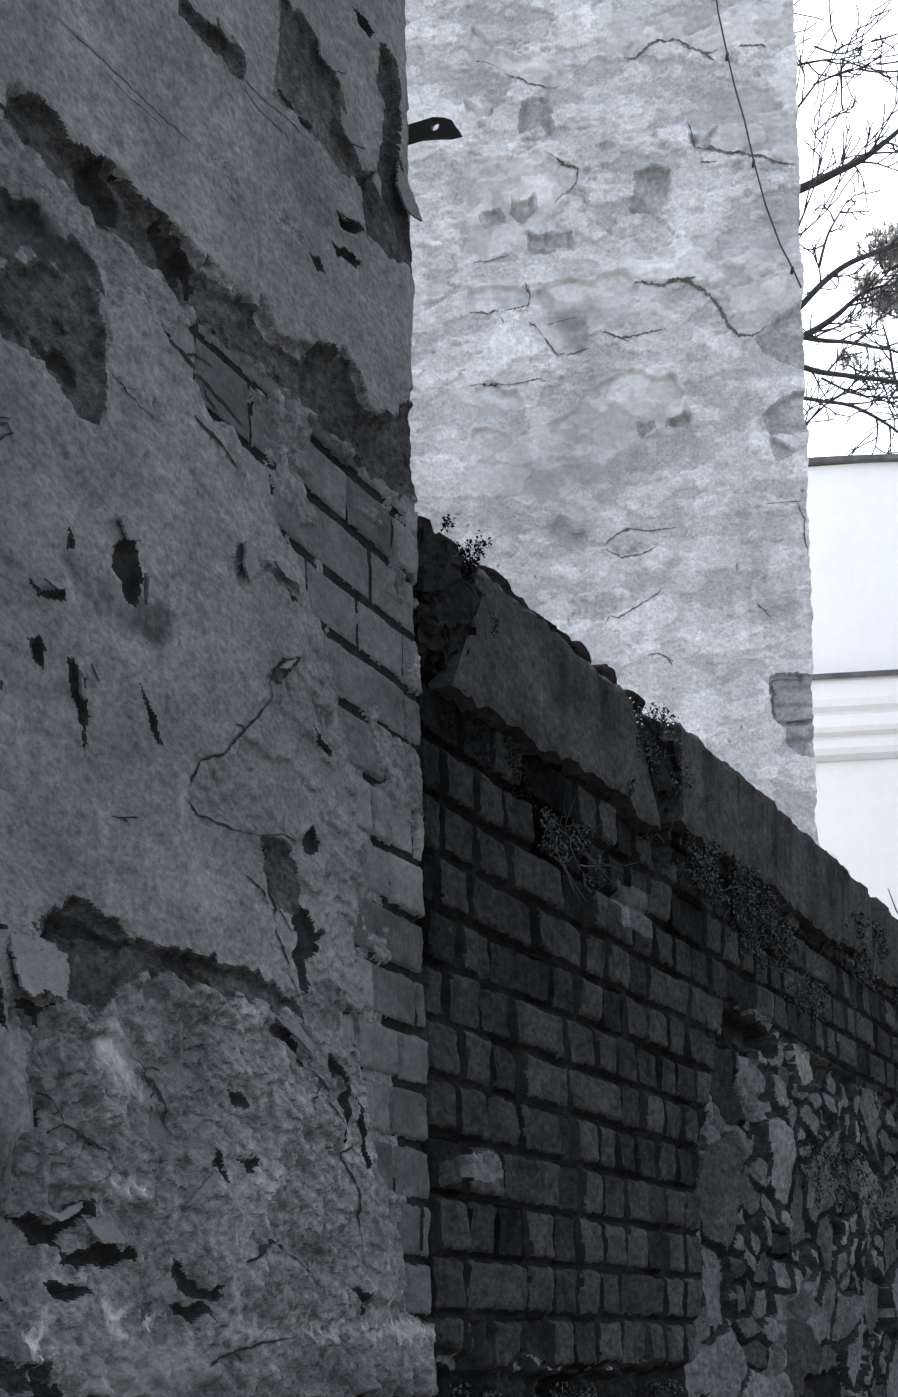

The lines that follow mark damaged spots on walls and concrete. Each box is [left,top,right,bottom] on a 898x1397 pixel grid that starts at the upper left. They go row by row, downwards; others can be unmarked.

flaking render [178,0,247,82]
crack [624,38,765,60]
crack [689,125,797,165]
flaking render [629,164,674,216]
flaking render [0,89,417,502]
crack [635,276,766,337]
flaking render [465,365,694,506]
flaking render [111,516,150,608]
crack [184,678,297,989]
flaking render [0,894,326,1052]
flaking render [11,1198,138,1272]
flaking render [0,1356,63,1397]